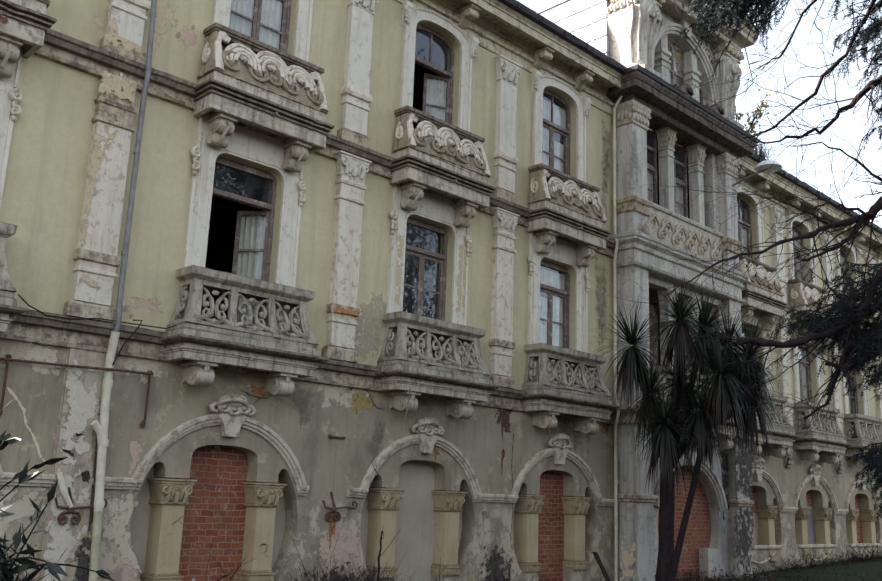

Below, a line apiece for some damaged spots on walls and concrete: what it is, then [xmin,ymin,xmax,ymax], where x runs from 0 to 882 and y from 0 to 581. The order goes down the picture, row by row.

peeling [102,0,197,54]
peeling [81,121,118,244]
crack [4,387,45,462]
peeling [0,342,101,581]
peeling [102,489,142,581]